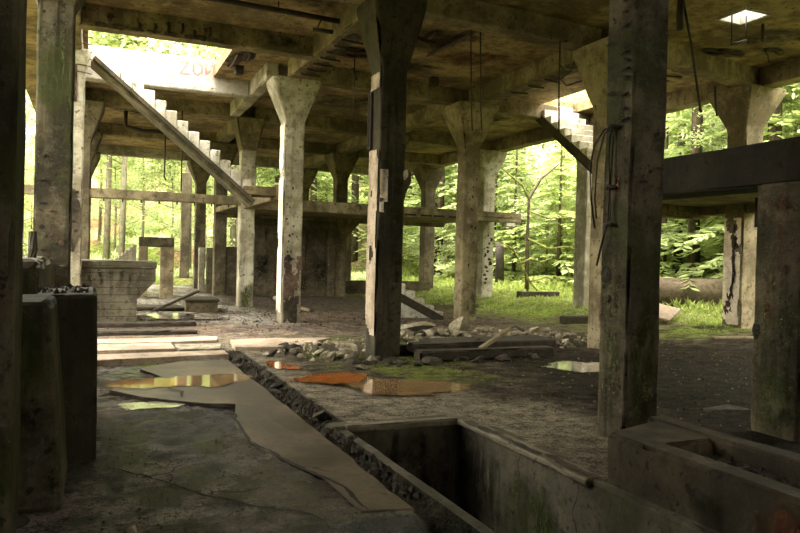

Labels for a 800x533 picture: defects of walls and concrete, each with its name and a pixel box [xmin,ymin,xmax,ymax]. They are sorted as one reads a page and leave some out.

peeling [276,123,302,323]
crack [103,464,329,521]
crack [140,386,369,510]